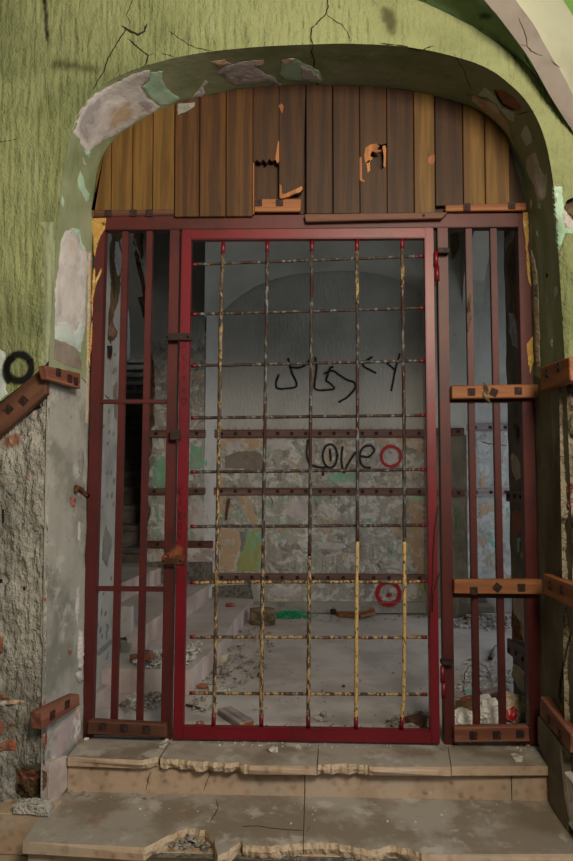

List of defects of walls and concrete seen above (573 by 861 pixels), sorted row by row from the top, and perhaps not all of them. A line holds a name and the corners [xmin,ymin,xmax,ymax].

crack [93,0,211,89]
peeling [212,58,322,86]
crack [310,0,351,85]
peeling [72,70,208,202]
flaking render [471,87,573,373]
flaking render [133,233,145,319]
peeling [54,218,122,424]
peeling [0,350,8,400]
flaking render [0,722,17,752]